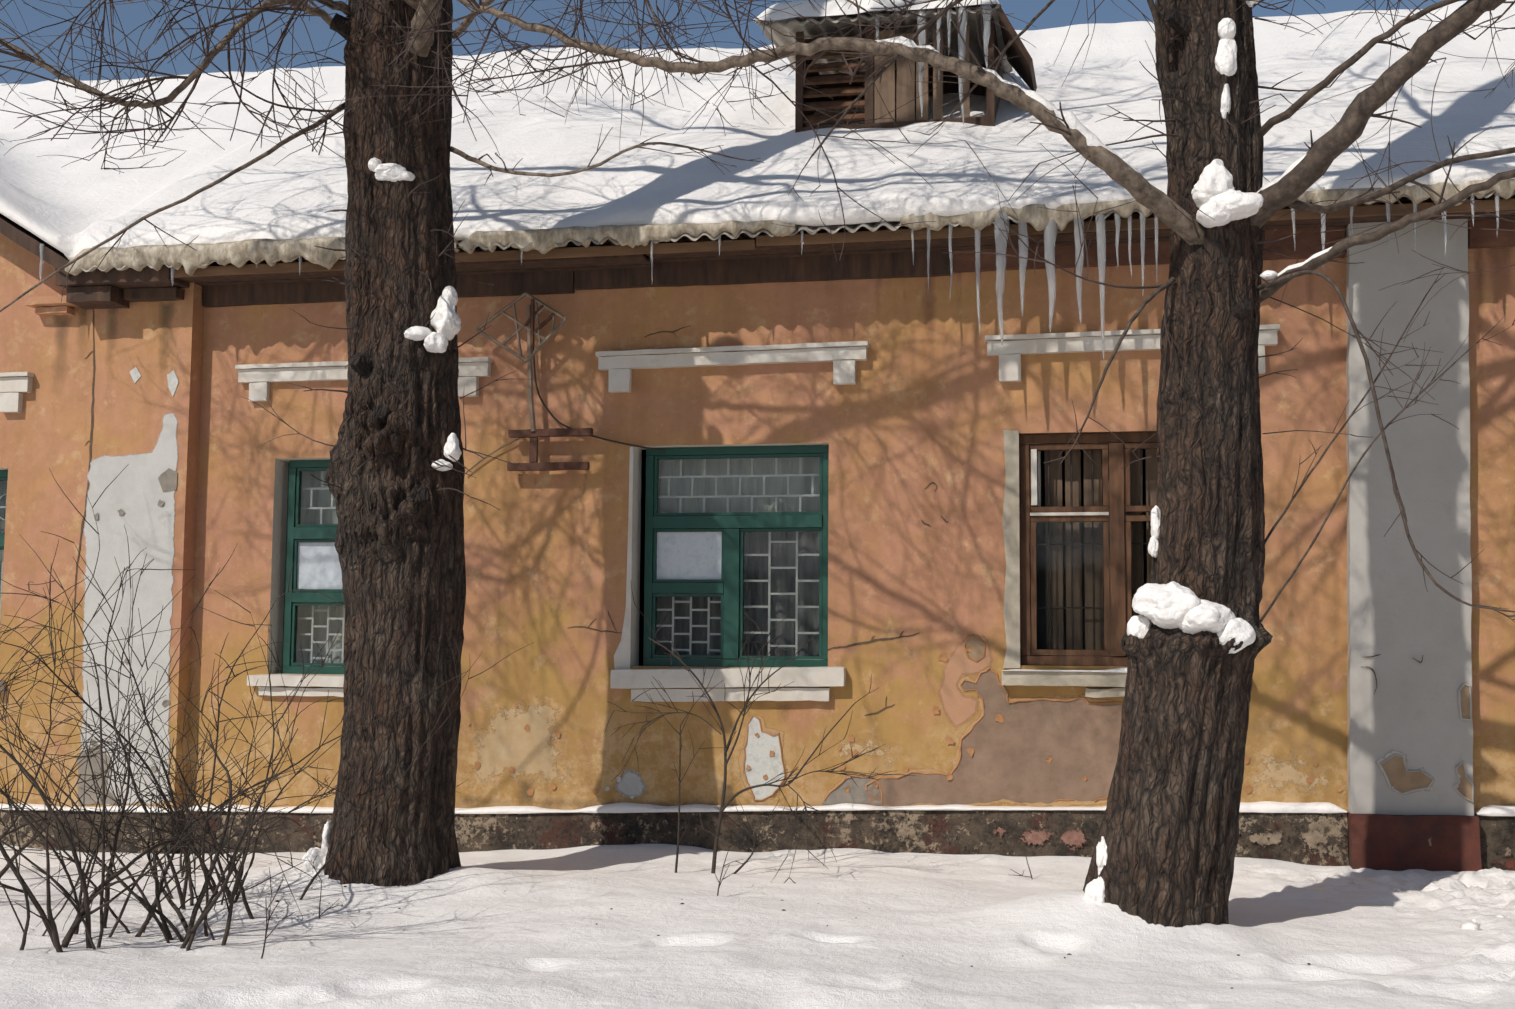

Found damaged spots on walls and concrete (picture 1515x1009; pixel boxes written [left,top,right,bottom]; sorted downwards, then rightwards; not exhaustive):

peeling [77,370,178,805]
peeling [605,771,646,799]
peeling [738,714,787,801]
flaking render [1377,751,1435,795]
flaking render [1454,761,1474,803]